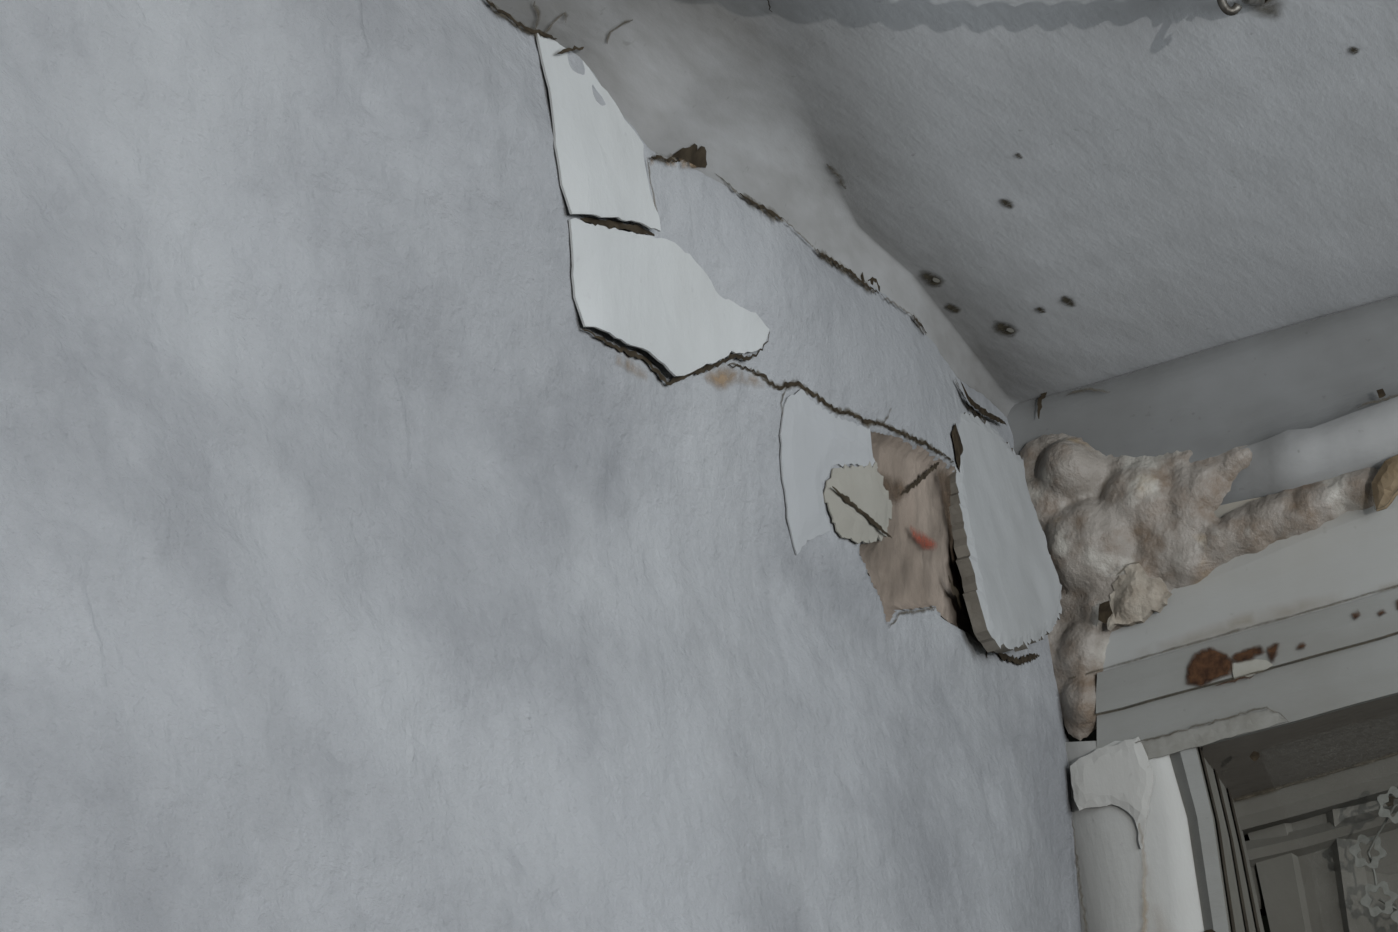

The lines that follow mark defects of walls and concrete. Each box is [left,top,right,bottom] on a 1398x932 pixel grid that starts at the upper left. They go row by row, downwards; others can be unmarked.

crack [486,0,632,54]
peeling [535,33,770,385]
crack [651,143,927,334]
crack [728,363,954,462]
crack [955,380,1106,425]
spalling [779,389,995,657]
rust [1186,644,1278,686]